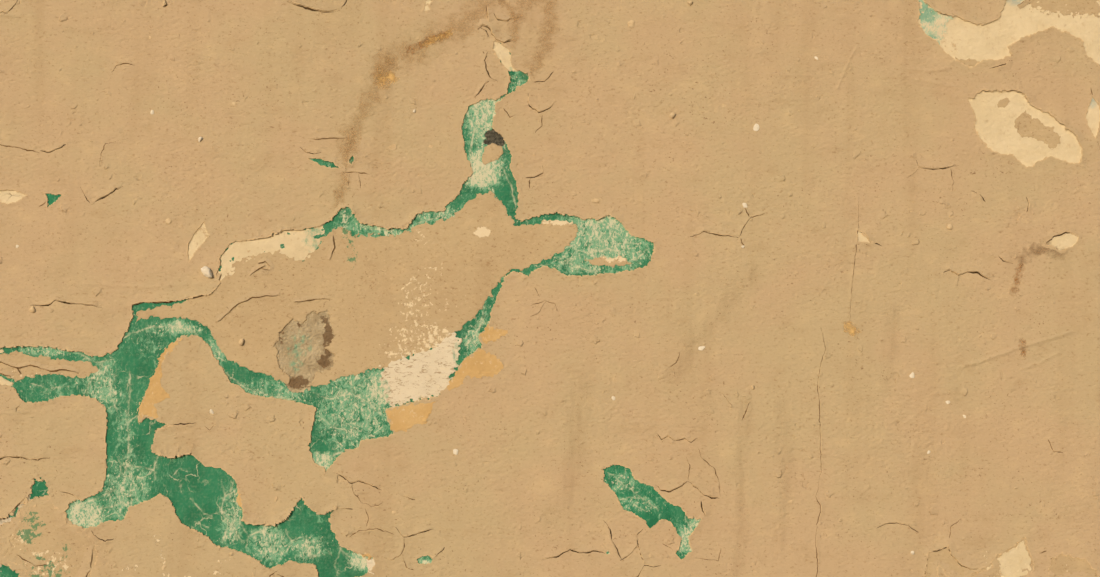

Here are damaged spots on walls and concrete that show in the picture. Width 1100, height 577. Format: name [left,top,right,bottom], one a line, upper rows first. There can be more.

peeling [909,0,1100,175]
peeling [0,35,661,577]
peeling [598,458,707,565]
peeling [963,532,1038,577]